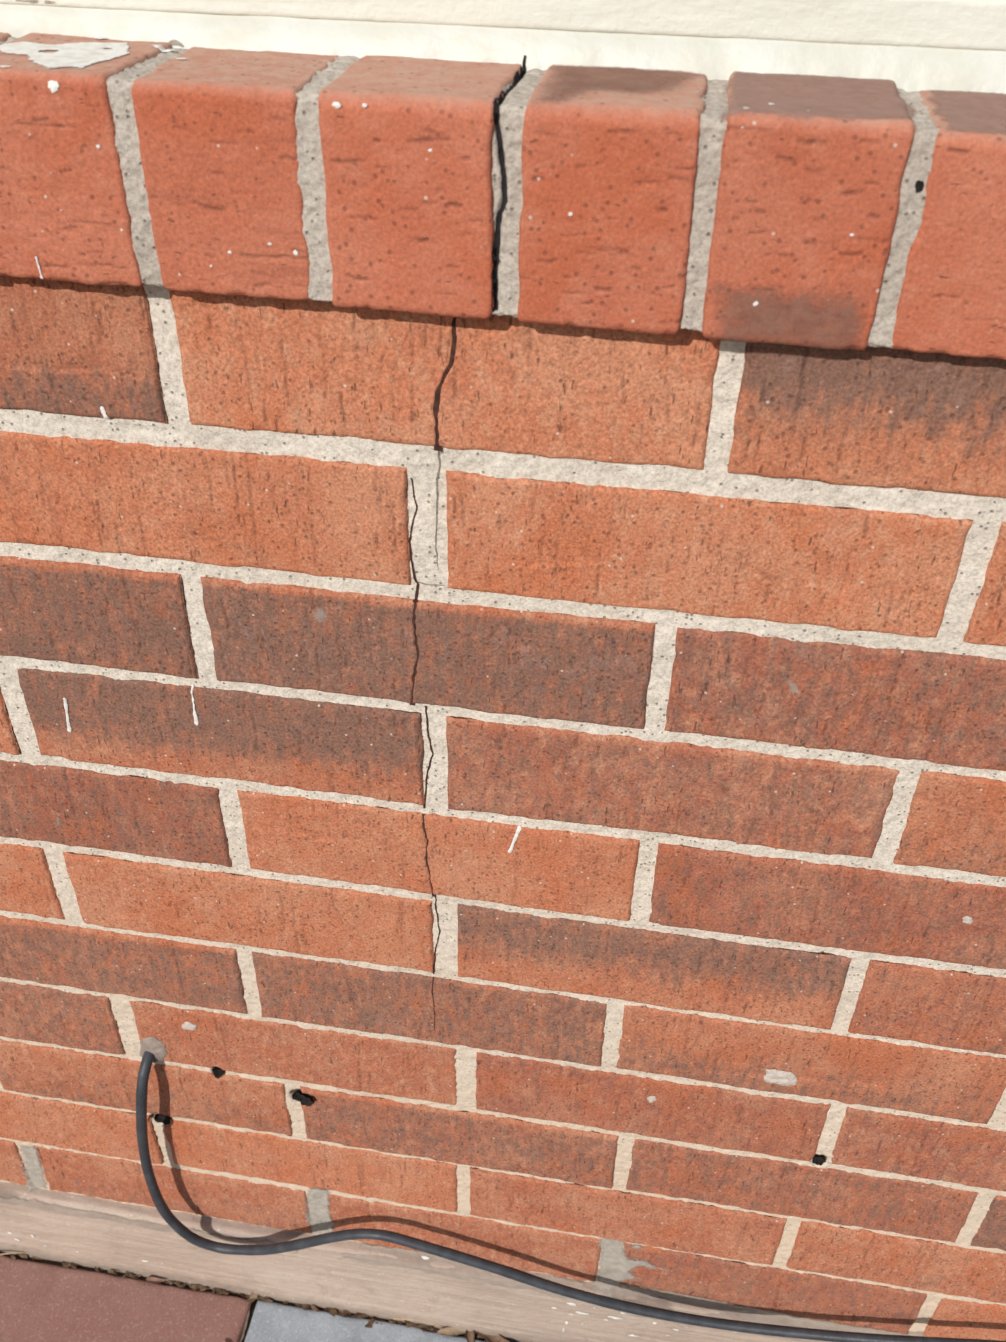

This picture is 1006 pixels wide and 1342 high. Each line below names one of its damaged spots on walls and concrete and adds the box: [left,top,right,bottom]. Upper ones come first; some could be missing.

crack [491,55,526,311]
crack [408,317,457,1031]